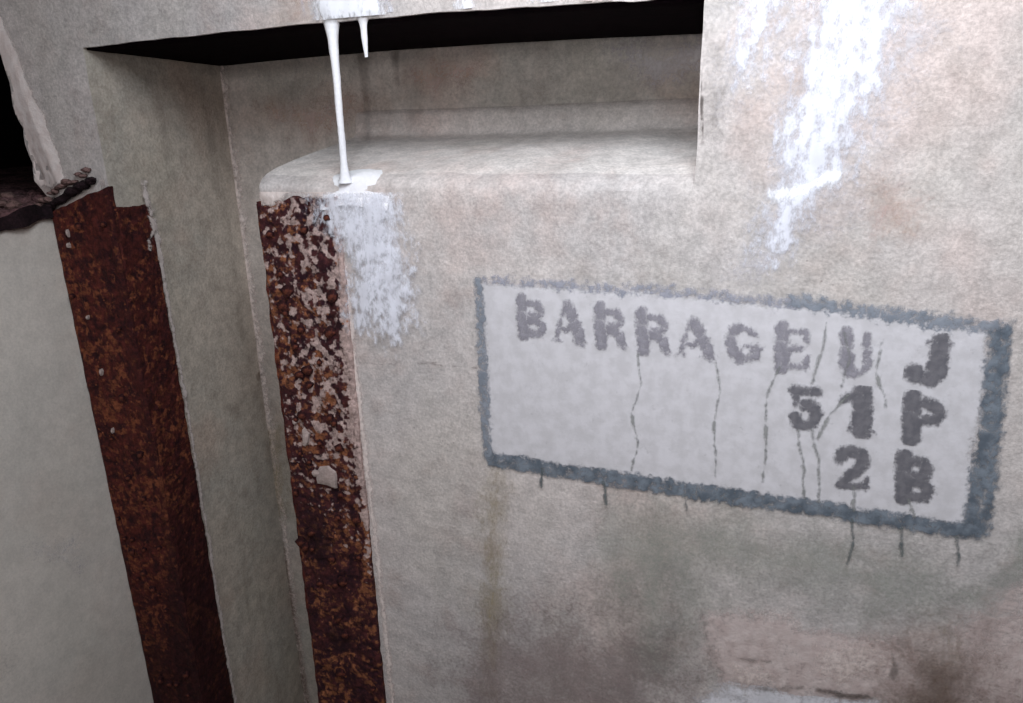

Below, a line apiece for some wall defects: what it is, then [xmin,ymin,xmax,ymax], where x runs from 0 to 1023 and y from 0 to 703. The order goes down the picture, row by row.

water stain [313,0,392,20]
efflorescence [455,0,472,9]
efflorescence [733,0,781,88]
efflorescence [752,0,912,269]
efflorescence [317,169,419,346]
rust [276,270,294,316]
rust [326,289,338,303]
rust [295,358,323,389]
rust [316,439,344,453]